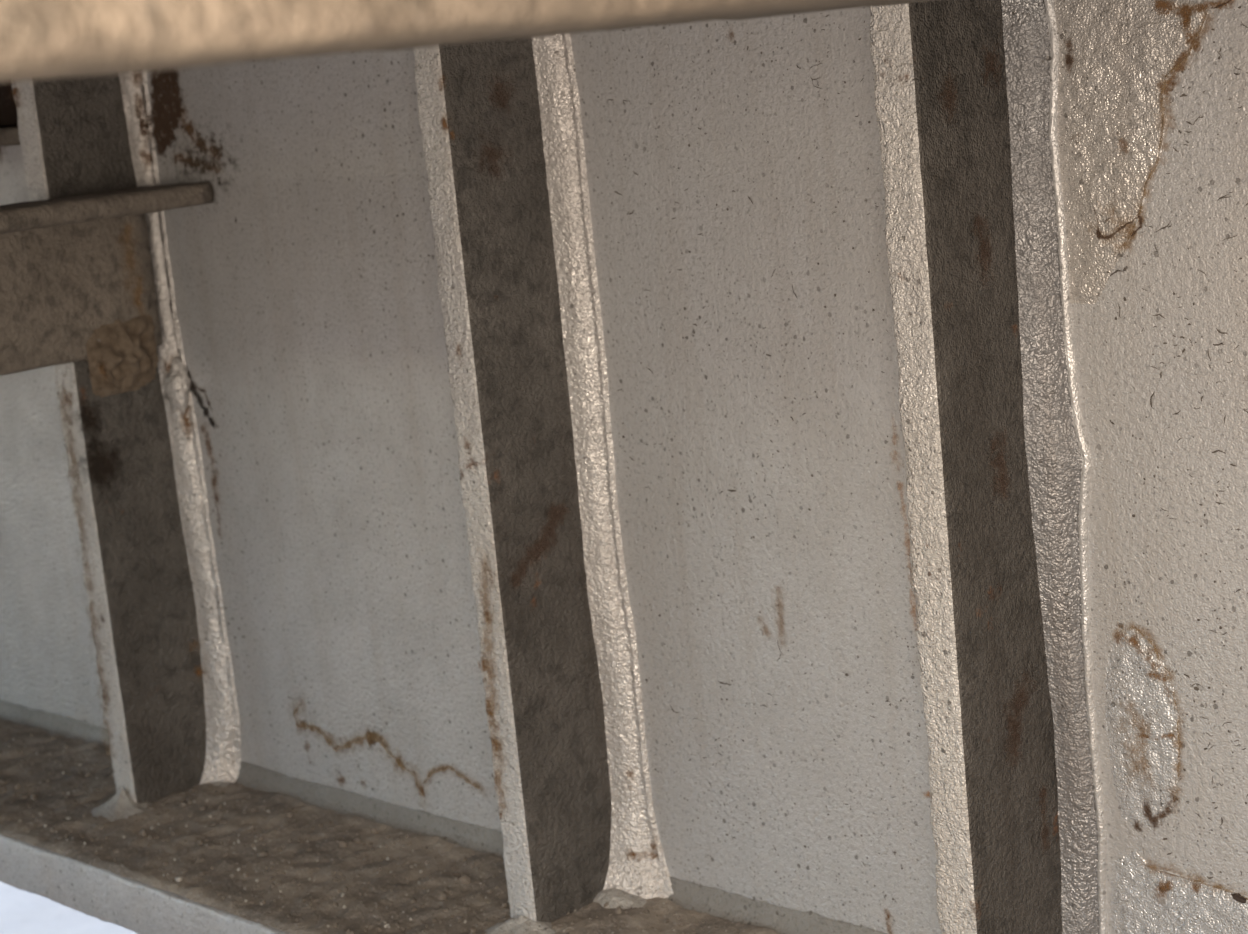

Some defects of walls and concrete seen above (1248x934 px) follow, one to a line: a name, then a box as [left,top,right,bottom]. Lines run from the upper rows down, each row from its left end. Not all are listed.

rust [134,69,235,186]
crack [293,704,483,795]